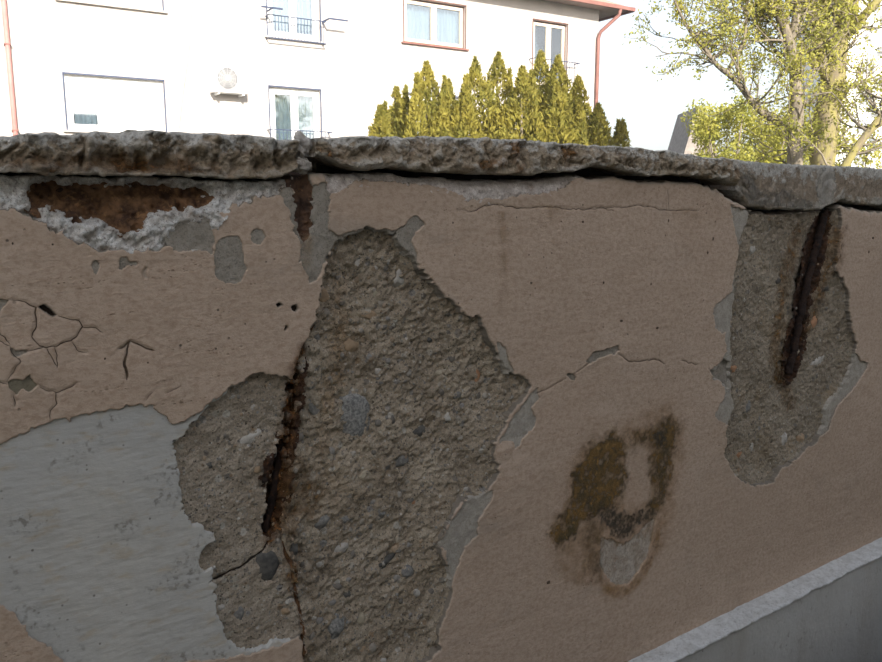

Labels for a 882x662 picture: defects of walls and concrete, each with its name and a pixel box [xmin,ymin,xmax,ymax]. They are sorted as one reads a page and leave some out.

crack [0,170,115,178]
crack [152,163,710,242]
crack [747,207,788,215]
crack [0,300,101,404]
crack [119,341,155,380]
spalling [710,205,855,484]
corrosion [769,207,843,411]
spalling [0,172,580,662]
crack [212,325,315,659]
corrosion [261,439,323,534]